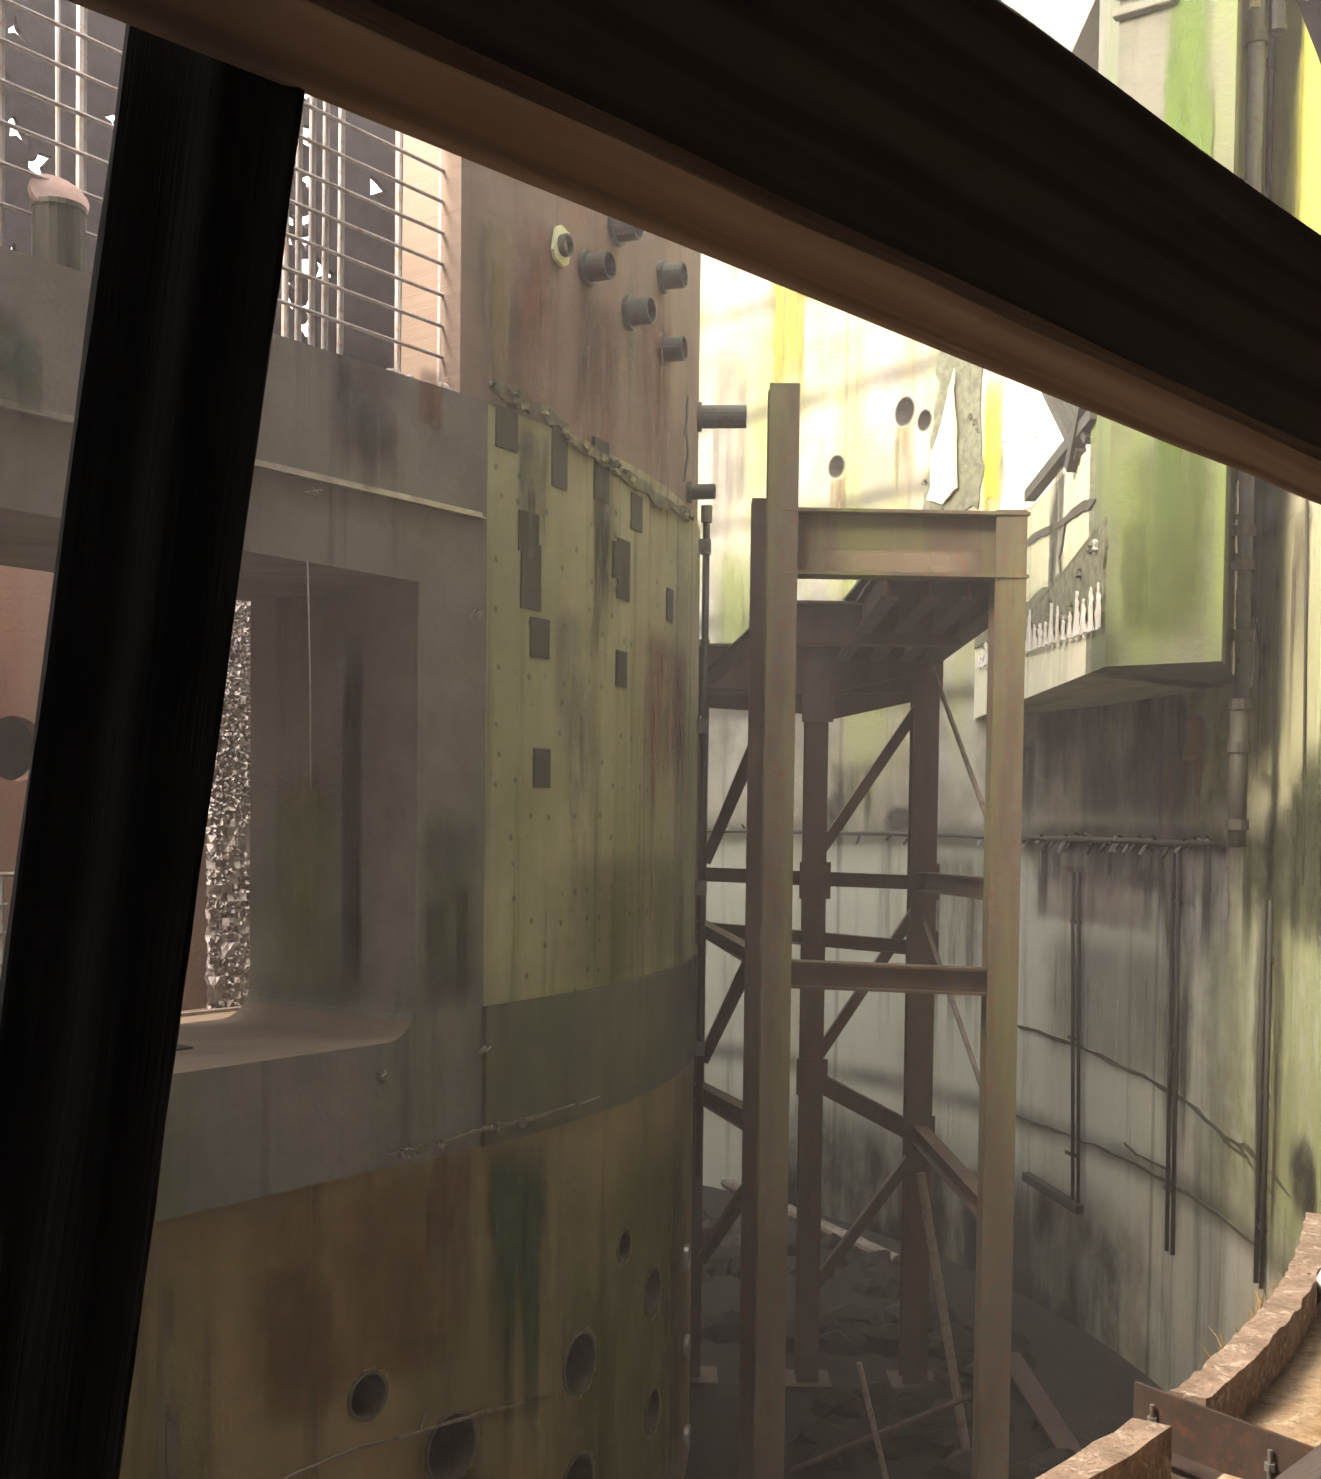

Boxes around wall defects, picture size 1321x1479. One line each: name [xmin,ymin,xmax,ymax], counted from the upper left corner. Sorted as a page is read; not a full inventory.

damp [1166,84,1213,156]
damp [1022,745,1034,802]
damp [1039,826,1252,1100]
crack [1016,1114,1254,1244]
crack [1018,1025,1290,1198]
damp [1255,935,1281,1206]